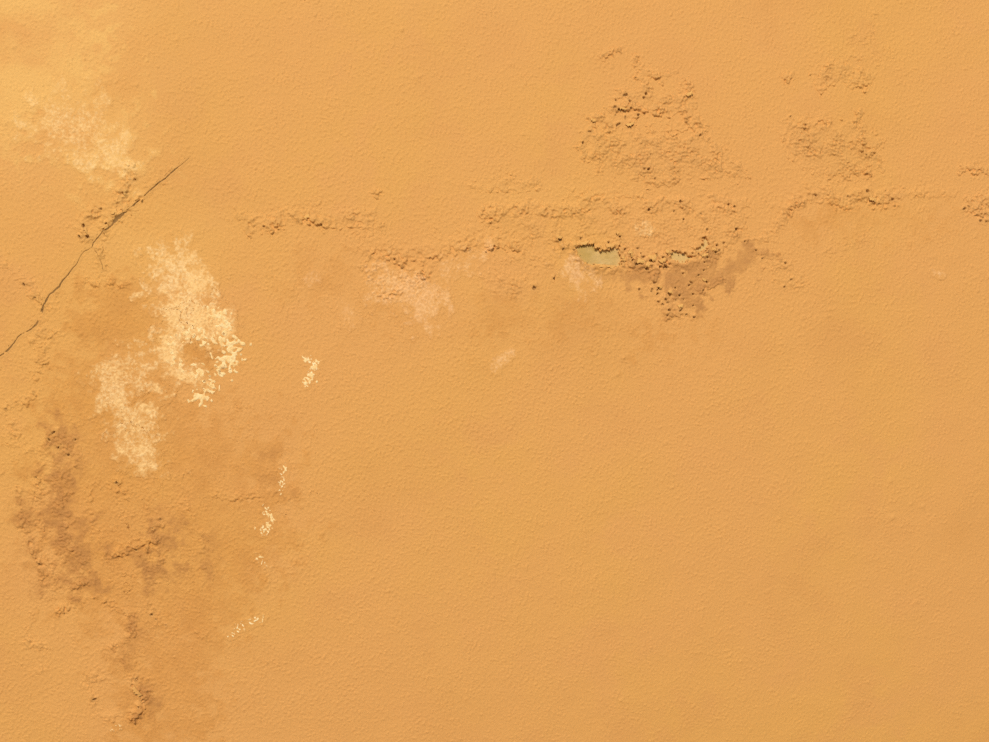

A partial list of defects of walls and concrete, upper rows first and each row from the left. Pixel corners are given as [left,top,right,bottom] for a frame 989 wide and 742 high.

crack [0,154,193,359]
peeling [230,186,387,239]
peeling [475,182,755,271]
water stain [0,169,982,742]